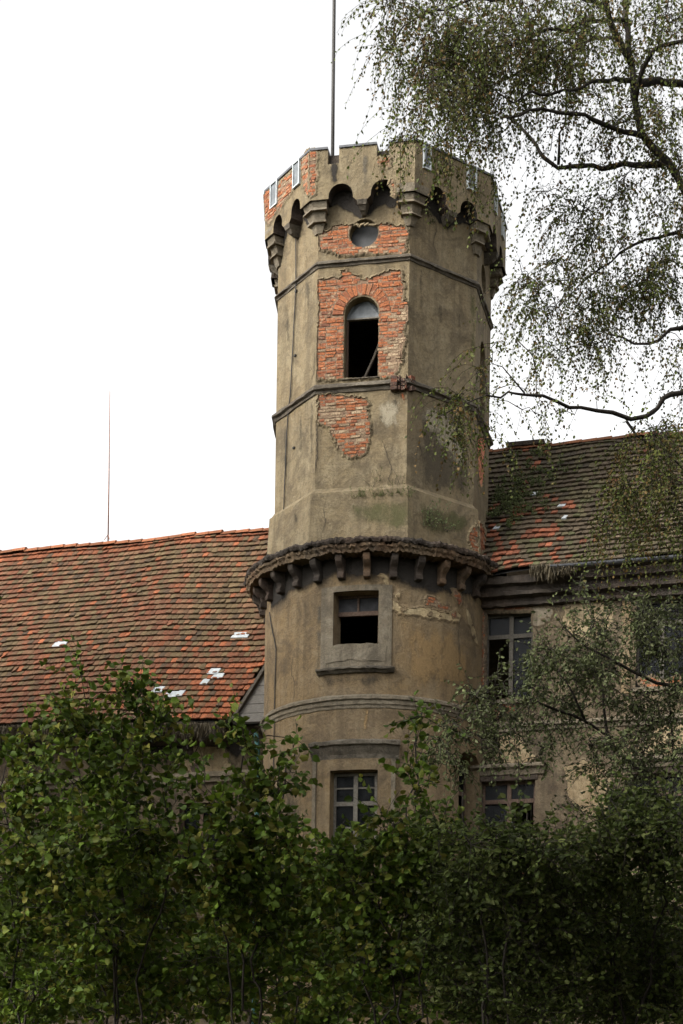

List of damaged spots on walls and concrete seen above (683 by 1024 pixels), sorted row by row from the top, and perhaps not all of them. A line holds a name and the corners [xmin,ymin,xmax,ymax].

flaking render [263,147,320,227]
flaking render [315,221,416,461]
peeling [376,573,615,686]